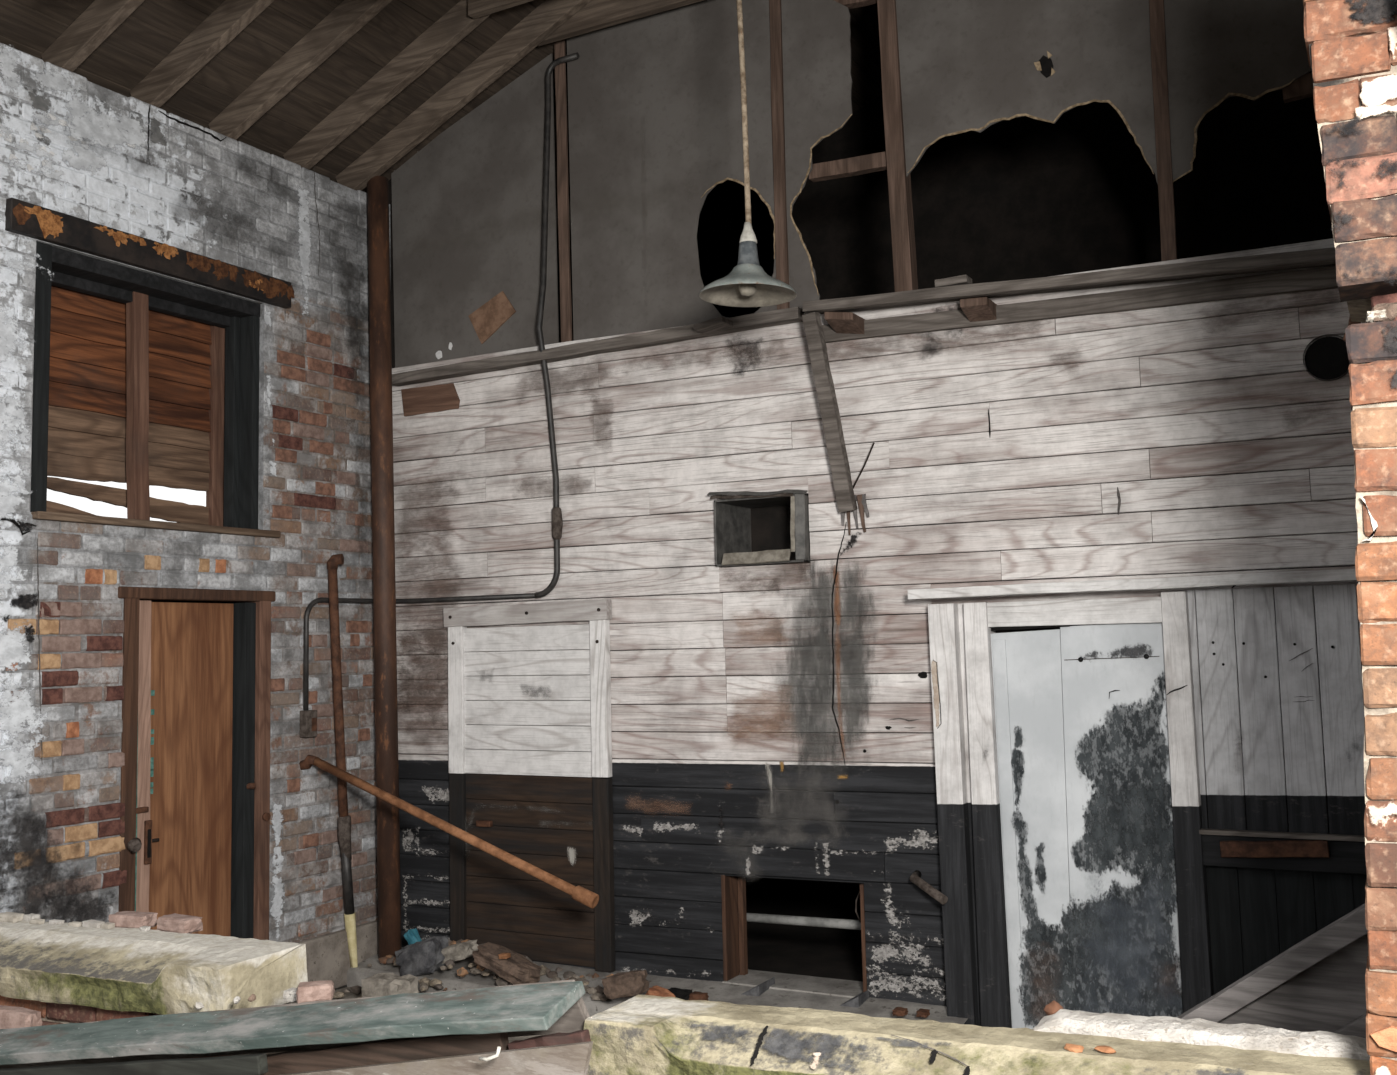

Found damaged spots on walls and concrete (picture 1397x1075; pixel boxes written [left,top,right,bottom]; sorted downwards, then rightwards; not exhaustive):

spalling [907,99,1154,174]
spalling [1173,78,1296,182]
corrosion [12,203,63,238]
corrosion [94,225,295,300]
water stain [785,578,862,755]
peeling [745,845,788,875]
peeling [1011,673,1183,1027]
spalling [1368,803,1397,825]
peeling [815,828,946,1001]
spalling [1370,1026,1397,1052]
spalling [1376,1066,1391,1075]